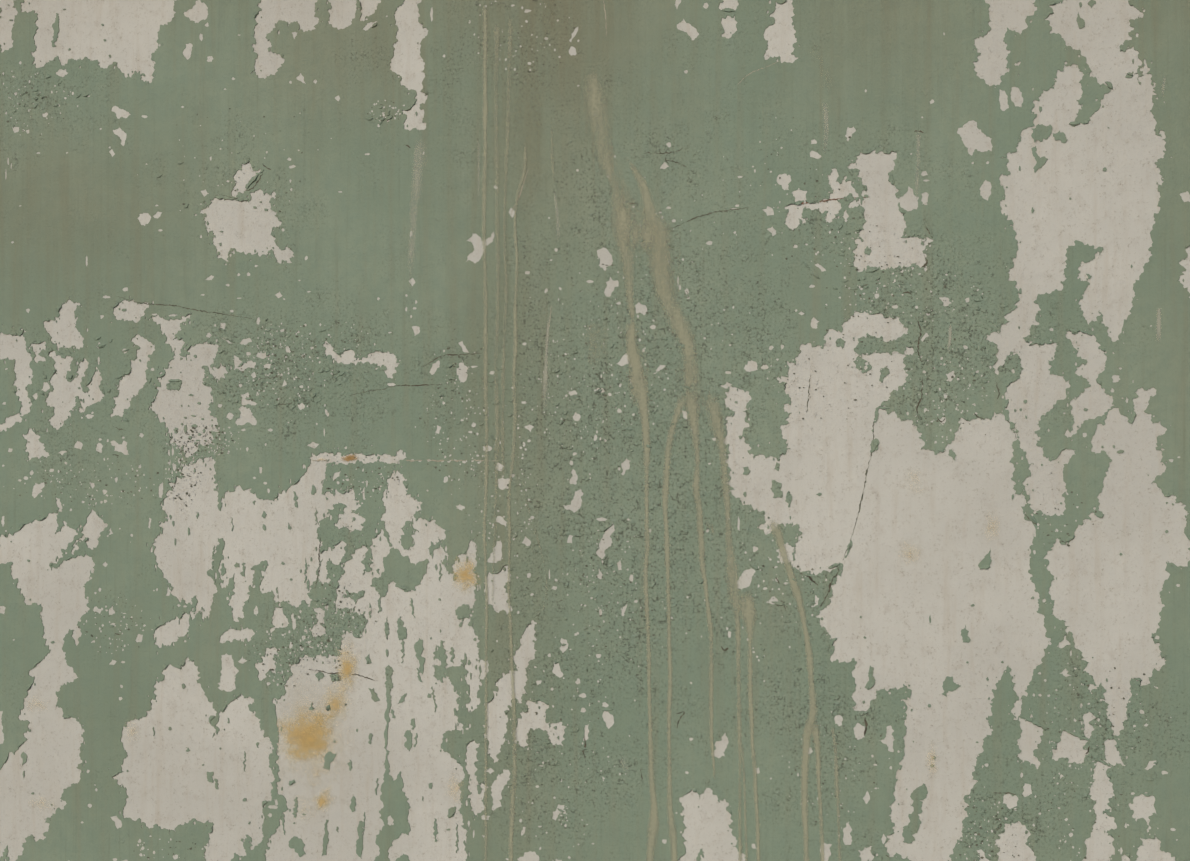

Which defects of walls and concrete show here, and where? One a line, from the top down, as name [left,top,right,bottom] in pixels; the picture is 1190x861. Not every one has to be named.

peeling [0,0,209,138]
peeling [251,0,433,131]
peeling [137,205,162,231]
peeling [180,140,308,286]
peeling [467,232,495,263]
peeling [624,201,737,302]
peeling [0,239,757,861]
water stain [482,8,527,861]
water stain [588,77,760,861]
crack [775,406,884,609]
peeling [703,0,1190,861]
water stain [771,523,824,861]